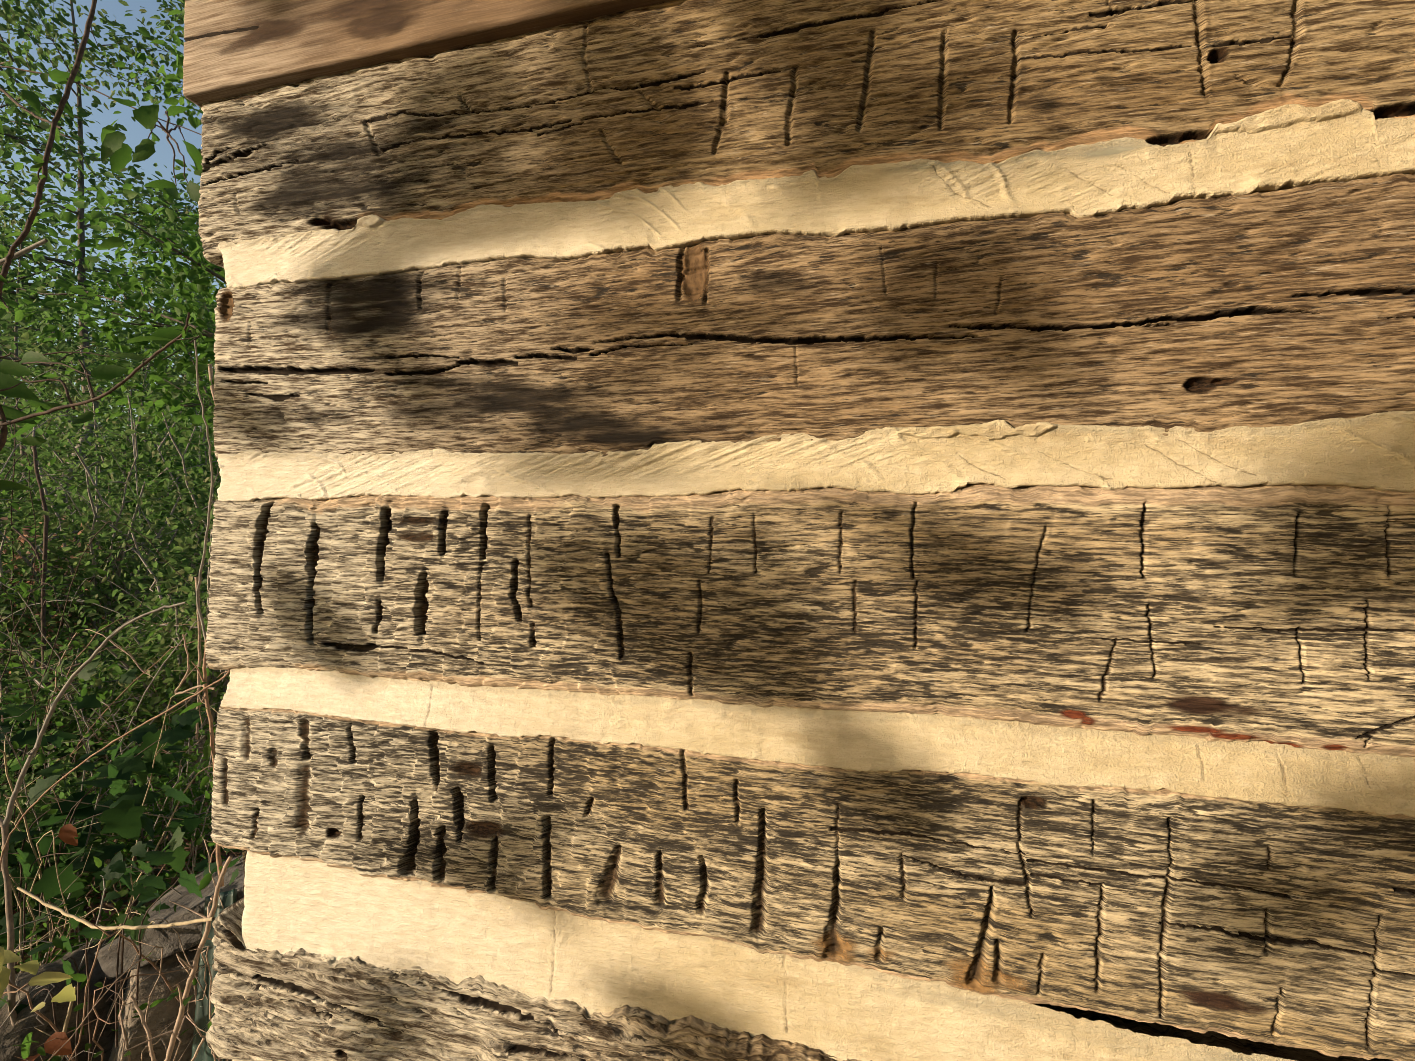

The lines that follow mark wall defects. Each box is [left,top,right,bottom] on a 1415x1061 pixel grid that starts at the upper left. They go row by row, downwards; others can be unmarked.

leakage [229,103,321,143]
leakage [254,142,424,217]
leakage [290,273,448,333]
crack [220,288,1415,402]
leakage [437,379,670,446]